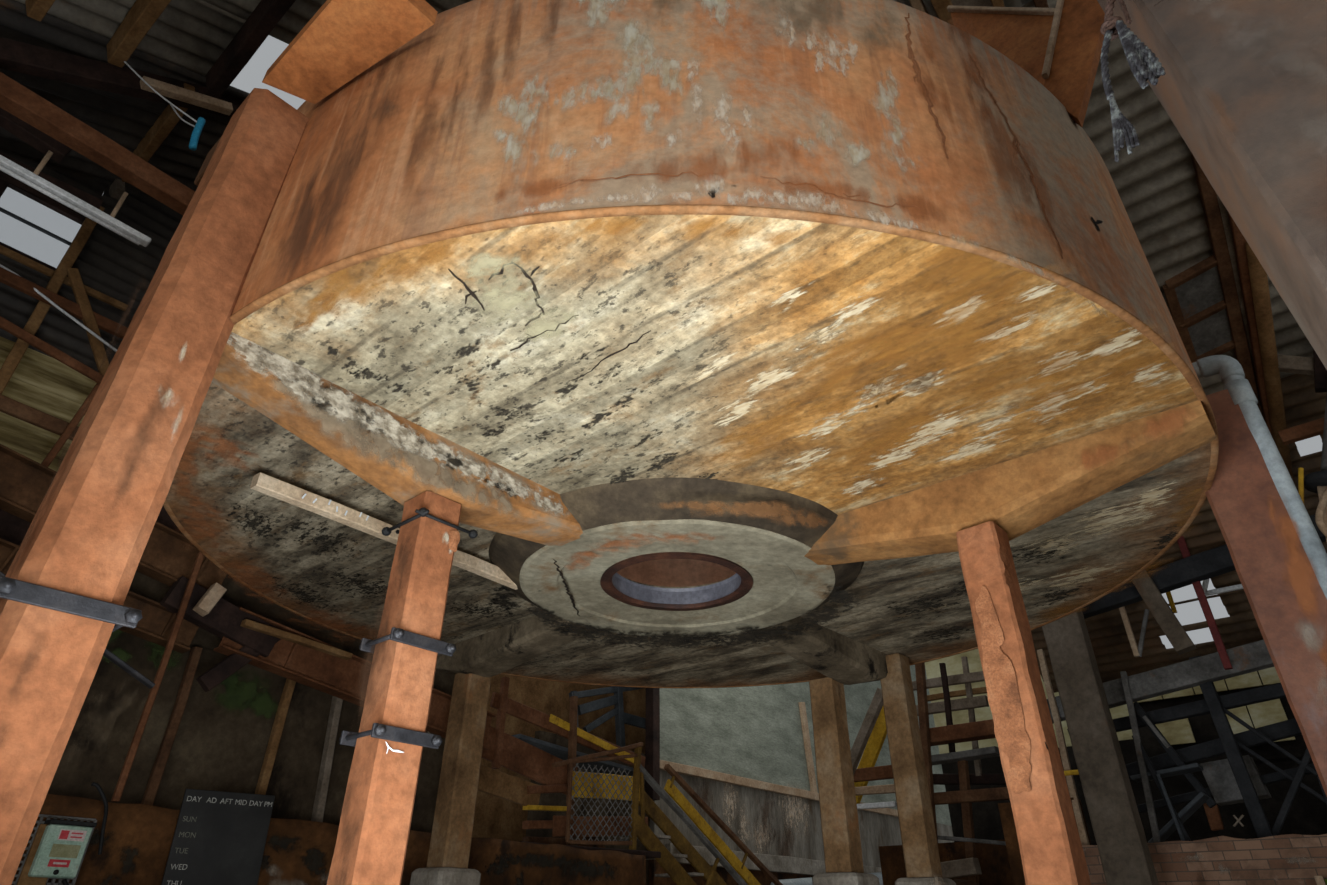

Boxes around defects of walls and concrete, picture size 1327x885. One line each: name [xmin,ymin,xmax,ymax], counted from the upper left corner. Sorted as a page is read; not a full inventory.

crack [905,13,949,159]
crack [968,53,1063,259]
crack [448,262,579,351]
water stain [327,346,411,396]
water stain [274,380,518,516]
peeling [227,332,568,515]
water stain [434,339,501,391]
water stain [555,346,621,397]
water stain [581,388,644,429]
rust [663,501,827,528]
crack [553,559,580,616]
rust [1272,514,1313,610]